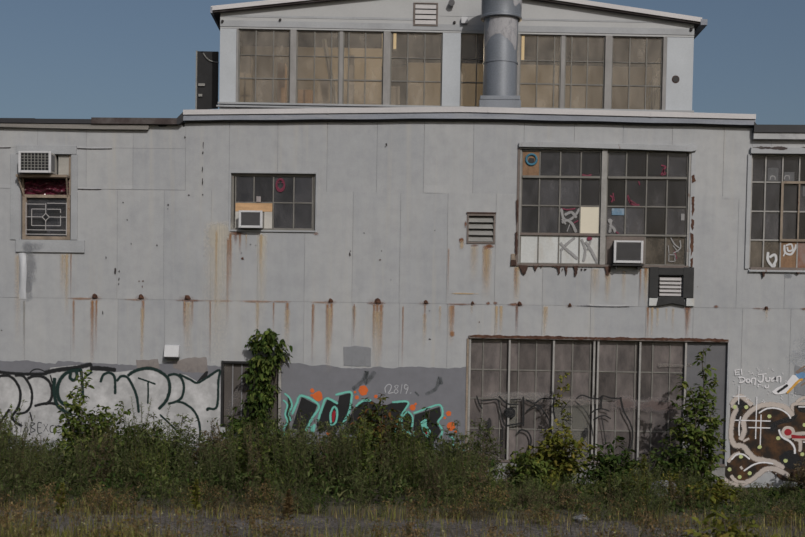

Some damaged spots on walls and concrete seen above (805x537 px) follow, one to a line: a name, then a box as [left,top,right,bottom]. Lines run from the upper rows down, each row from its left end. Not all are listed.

corrosion [511,200,542,283]
corrosion [73,294,98,325]
corrosion [370,298,383,324]
corrosion [449,293,474,336]